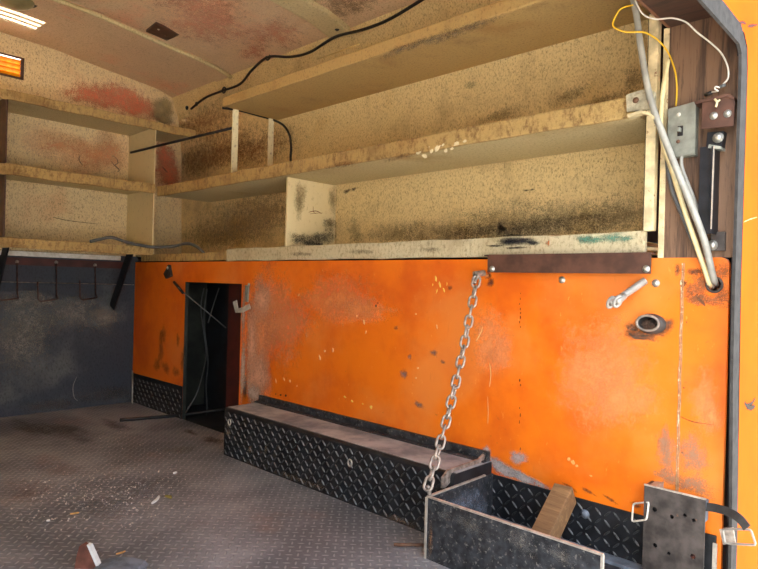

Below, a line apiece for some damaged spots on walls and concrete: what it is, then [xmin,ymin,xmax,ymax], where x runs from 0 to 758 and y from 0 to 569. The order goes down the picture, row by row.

rust [675,265,728,307]
rust [626,320,673,340]